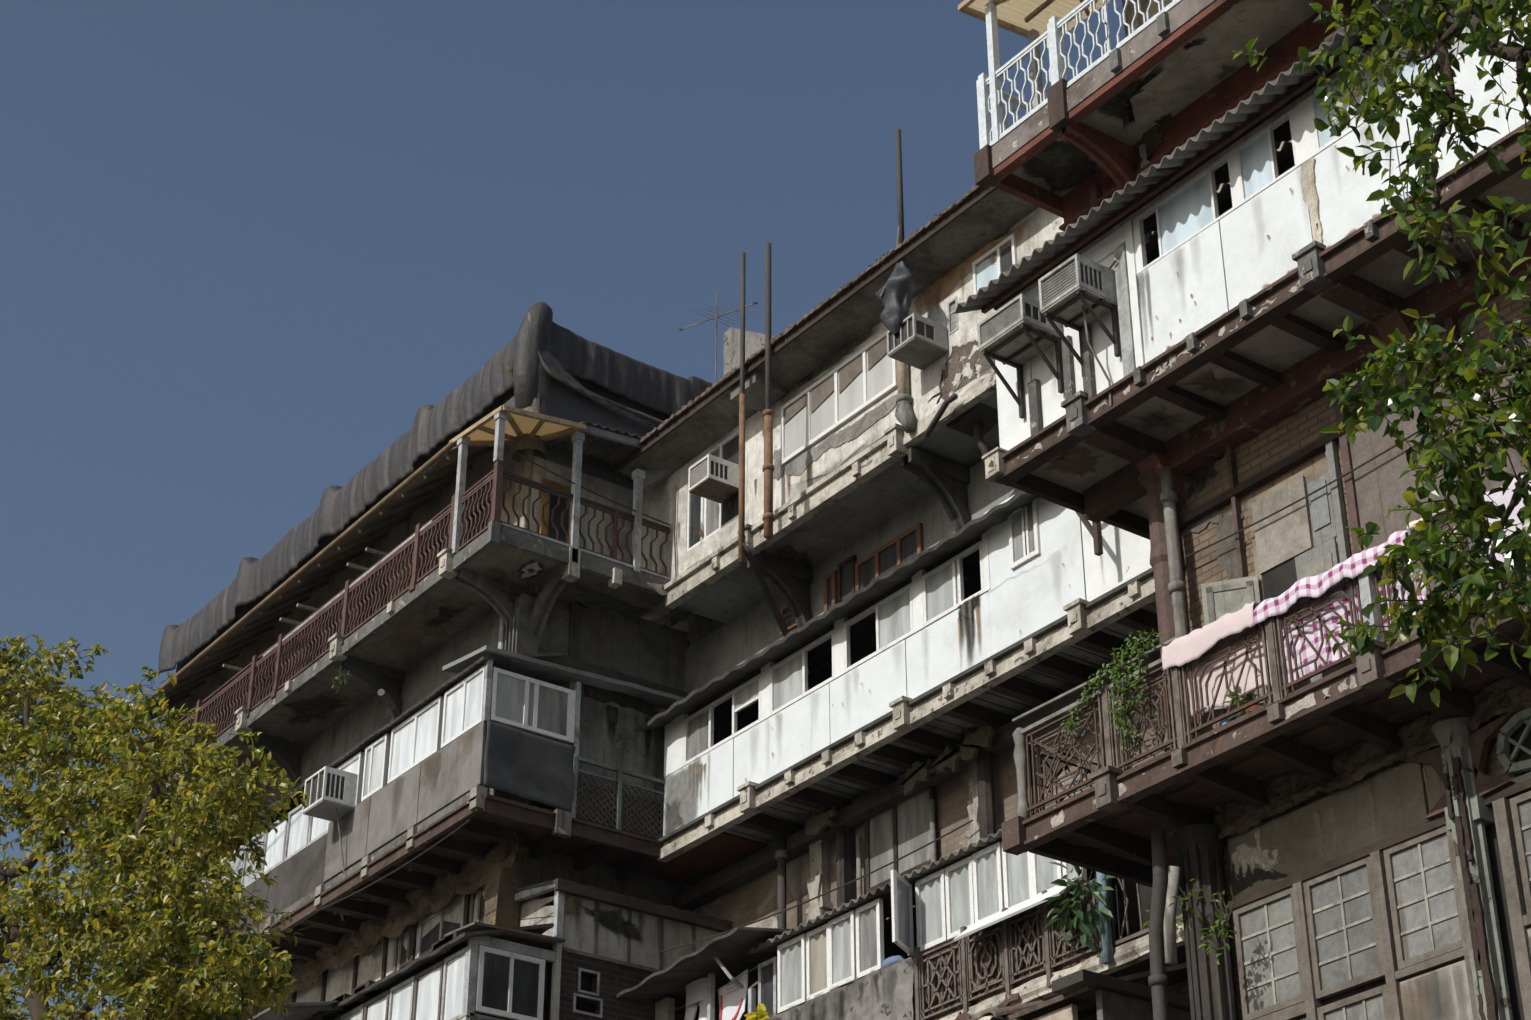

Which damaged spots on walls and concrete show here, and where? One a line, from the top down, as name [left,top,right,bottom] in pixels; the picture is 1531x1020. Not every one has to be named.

peeling [940,340,995,400]
damp [958,598,980,658]
peeling [1230,830,1289,896]
spalling [990,993,1021,1020]